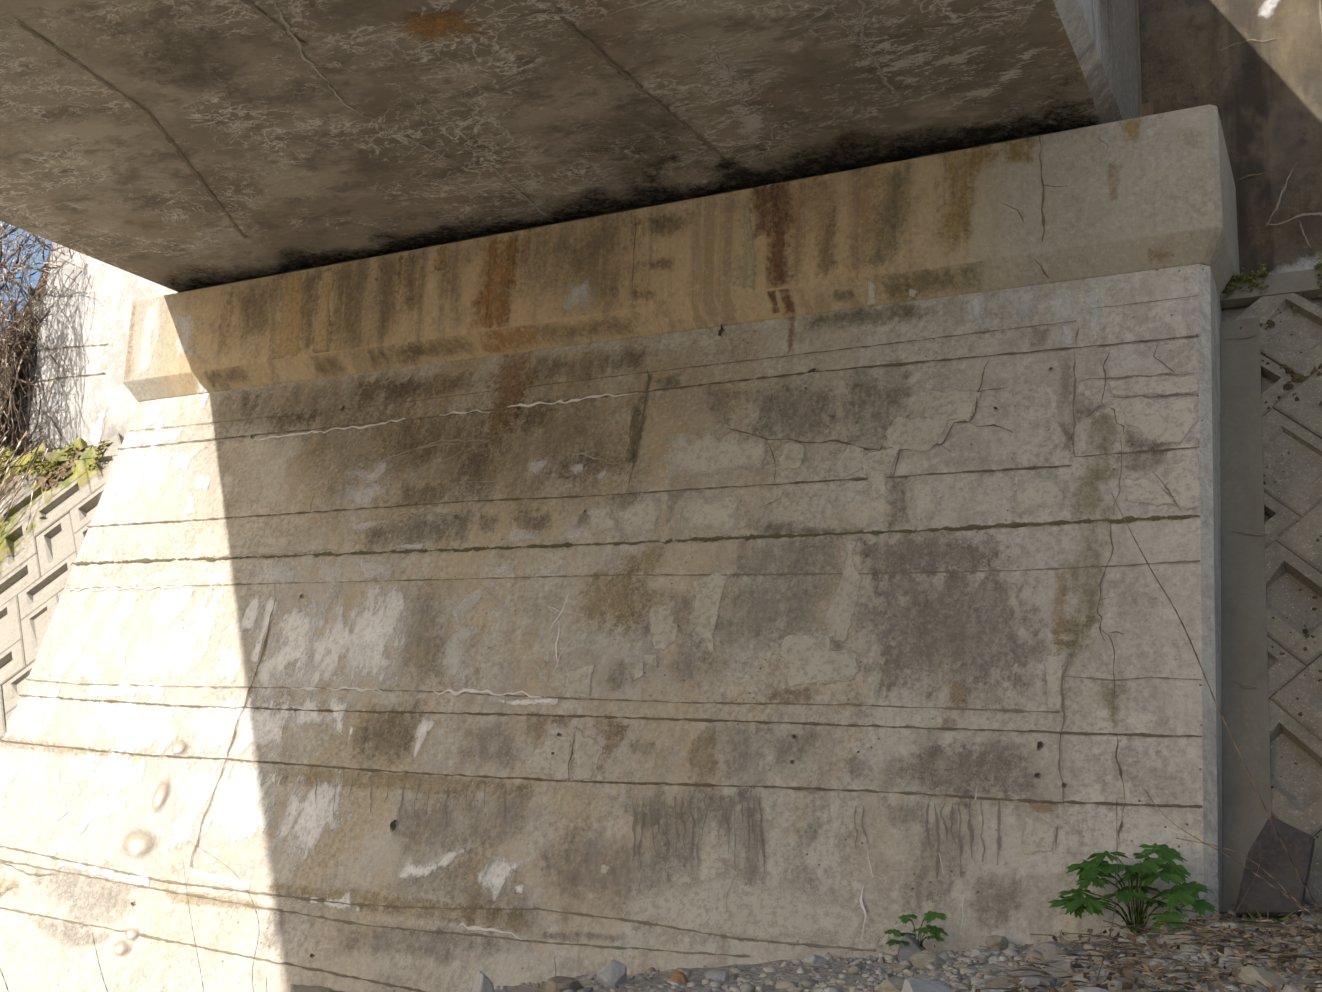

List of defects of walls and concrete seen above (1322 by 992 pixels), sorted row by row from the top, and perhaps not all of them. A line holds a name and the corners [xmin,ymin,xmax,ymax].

damp [793,0,1047,104]
damp [166,30,1099,340]
crack [1005,136,1063,278]
crack [727,361,1013,508]
damp [0,583,407,889]
damp [413,718,435,760]
damp [400,849,464,878]
damp [477,855,530,901]
damp [632,796,765,875]
damp [926,800,1001,877]
crack [1055,661,1068,851]
crack [1115,733,1126,842]